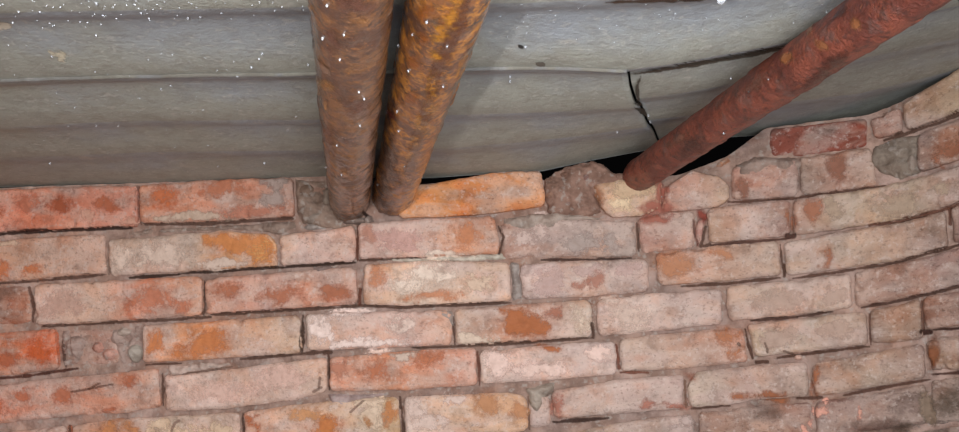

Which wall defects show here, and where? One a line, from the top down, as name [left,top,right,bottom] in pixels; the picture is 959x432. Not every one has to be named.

corrosion [435,0,462,42]
crack [631,46,784,117]
corrosion [640,182,672,223]